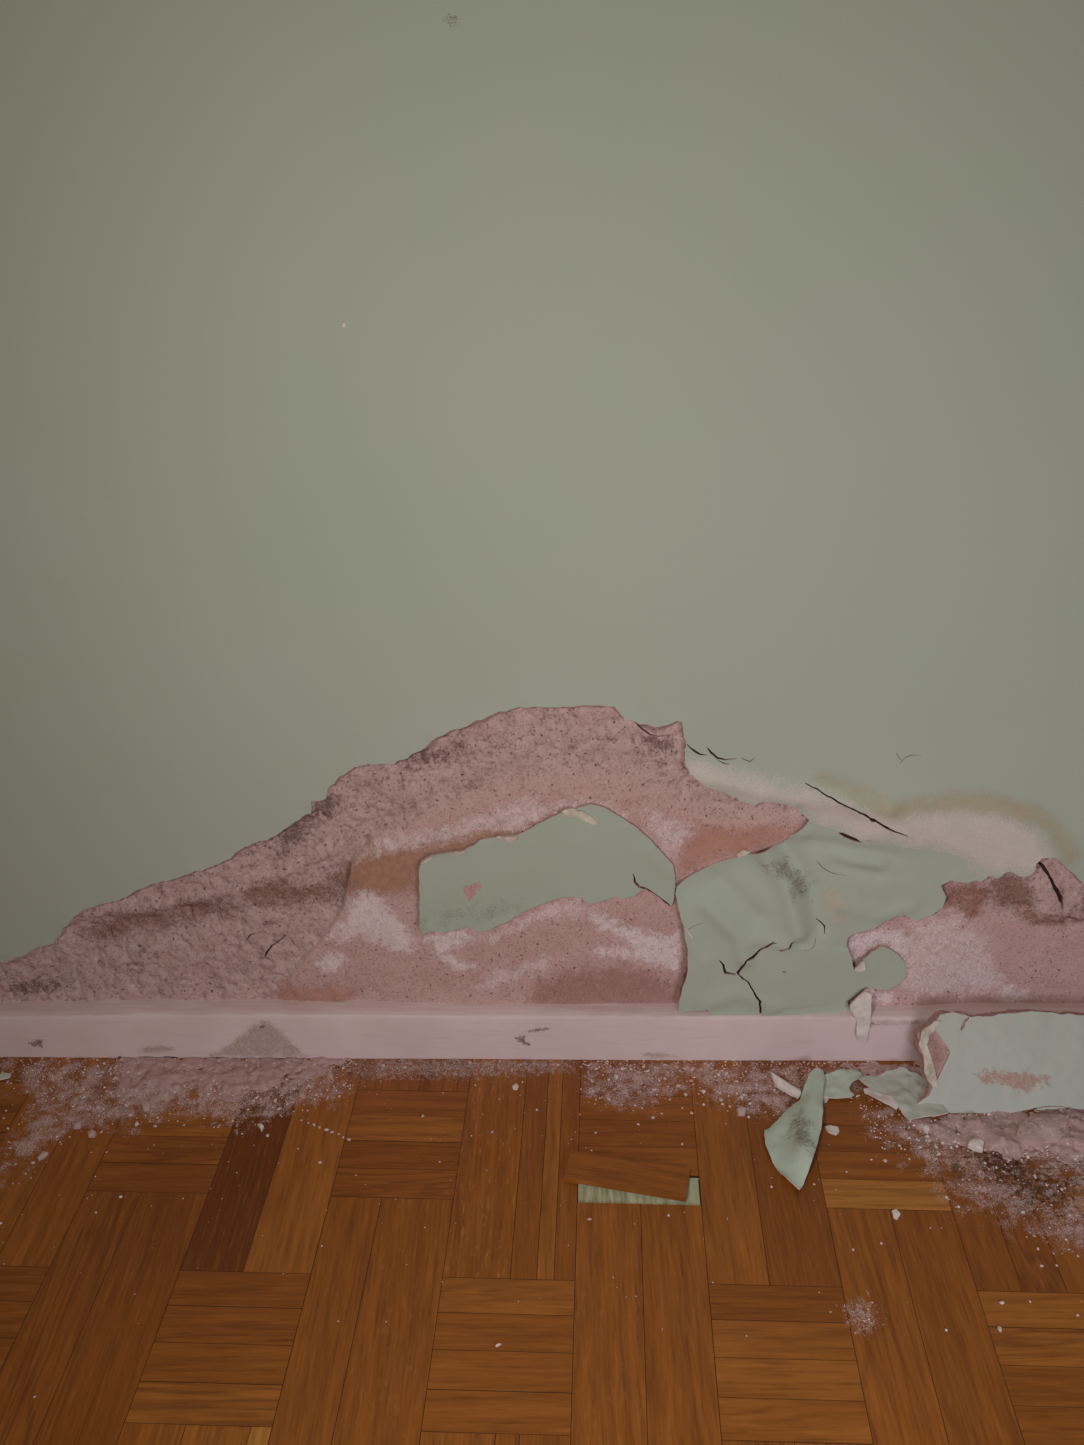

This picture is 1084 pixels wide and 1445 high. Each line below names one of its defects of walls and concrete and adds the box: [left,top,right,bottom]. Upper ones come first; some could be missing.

crack [806,783,902,842]
water stain [638,732,1084,881]
spalling [0,705,809,1004]
crack [1038,861,1074,918]
crack [720,942,792,1013]
spalling [846,858,1084,1042]
peeling [823,1067,948,1121]
peeling [825,1125,839,1136]